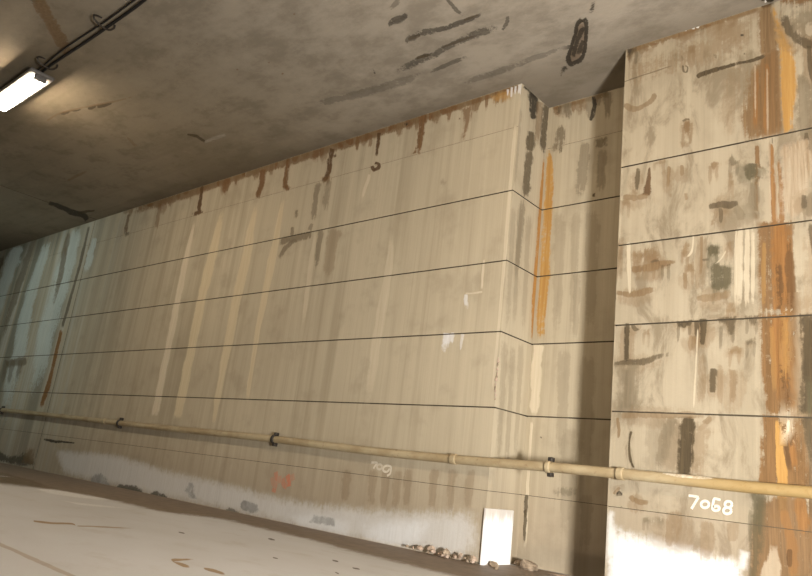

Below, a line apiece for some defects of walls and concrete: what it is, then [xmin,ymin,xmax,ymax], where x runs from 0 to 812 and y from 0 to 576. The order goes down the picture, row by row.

leakage [0,227,97,434]
corrosion [39,225,90,408]
corrosion [310,148,337,223]
leakage [123,84,614,554]
leakage [315,12,499,106]
corrosion [411,114,428,155]
corrosion [529,149,555,416]
leakage [611,0,812,486]
corrosion [739,0,811,486]
leakage [53,447,484,562]
leakage [605,484,774,576]
corrosion [746,496,811,576]